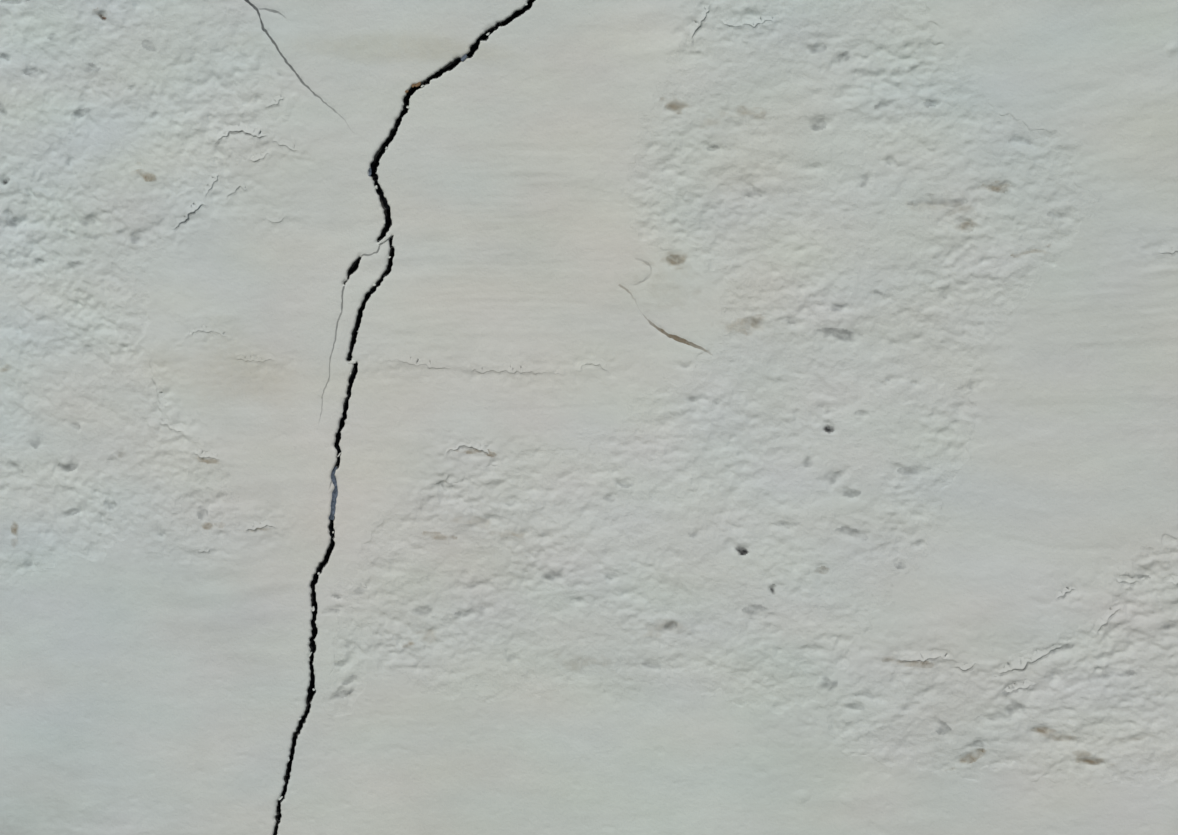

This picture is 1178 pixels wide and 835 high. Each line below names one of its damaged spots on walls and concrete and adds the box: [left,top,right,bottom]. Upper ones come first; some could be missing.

crack [245,0,284,59]
crack [273,0,536,835]